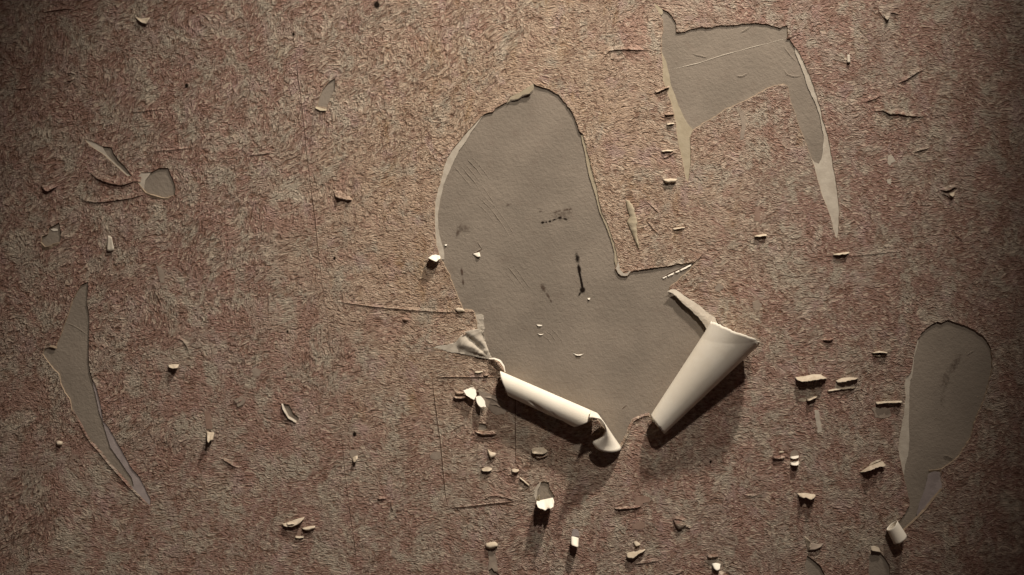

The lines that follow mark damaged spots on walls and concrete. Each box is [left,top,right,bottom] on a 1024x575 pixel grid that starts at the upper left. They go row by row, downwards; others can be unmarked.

peeling [654,3,839,238]
peeling [77,139,175,203]
peeling [428,84,760,453]
peeling [872,401,902,418]
peeling [531,447,548,458]